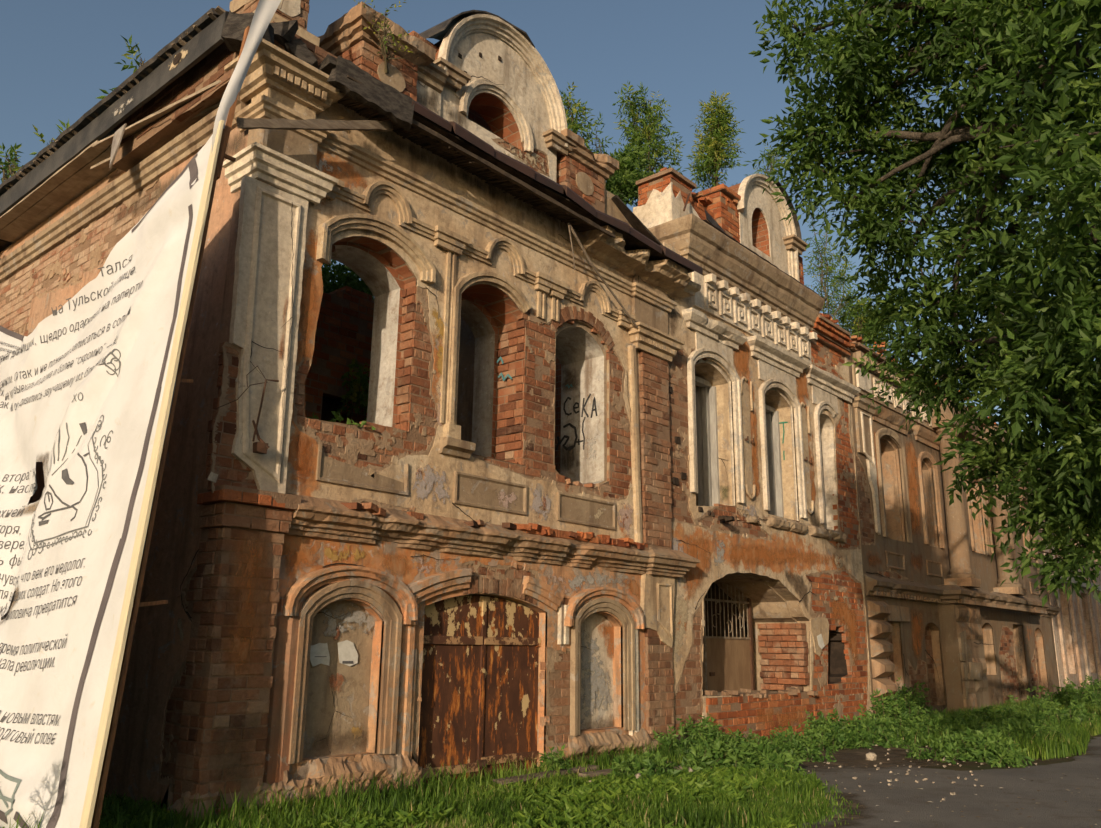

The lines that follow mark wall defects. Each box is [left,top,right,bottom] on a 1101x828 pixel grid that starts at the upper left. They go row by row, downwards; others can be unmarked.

flaking render [293,286,450,520]
flaking render [458,560,630,594]
flaking render [673,578,706,739]
flaking render [806,569,869,725]